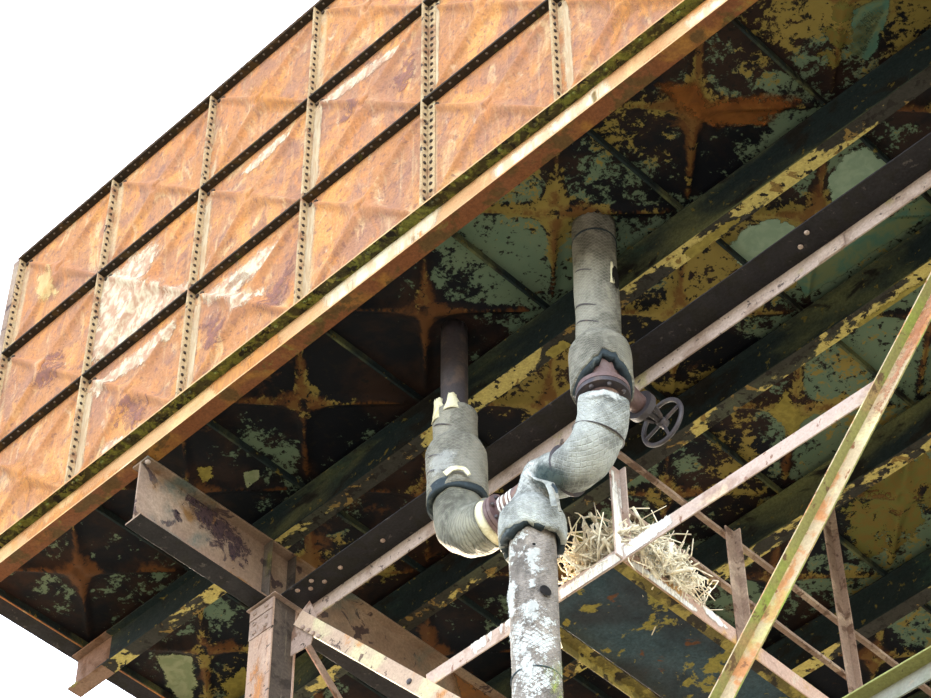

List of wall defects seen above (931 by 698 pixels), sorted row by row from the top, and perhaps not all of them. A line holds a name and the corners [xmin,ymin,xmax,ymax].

peeling [827,147,886,202]
peeling [91,242,188,362]
peeling [202,241,278,311]
peeling [797,195,931,297]
rust [31,349,66,389]
peeling [89,317,176,396]
rust [210,335,280,394]
rust [877,296,931,411]
rust [27,468,120,539]
rust [175,491,252,569]
peeling [507,580,547,622]
rust [453,672,491,698]